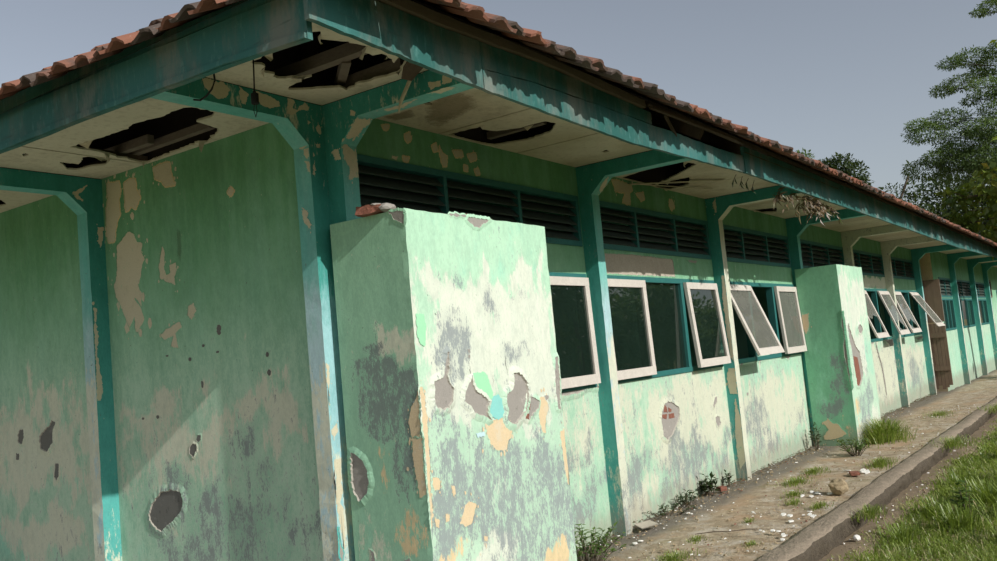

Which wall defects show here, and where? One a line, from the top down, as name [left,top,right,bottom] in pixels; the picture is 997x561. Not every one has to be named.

peeling [150,161,178,188]
peeling [202,78,322,175]
peeling [330,110,390,184]
peeling [431,142,480,176]
peeling [97,171,197,357]
spalling [839,310,863,390]
spalling [15,415,61,483]
spalling [407,346,599,530]
spalling [658,397,680,445]
spalling [146,482,188,538]